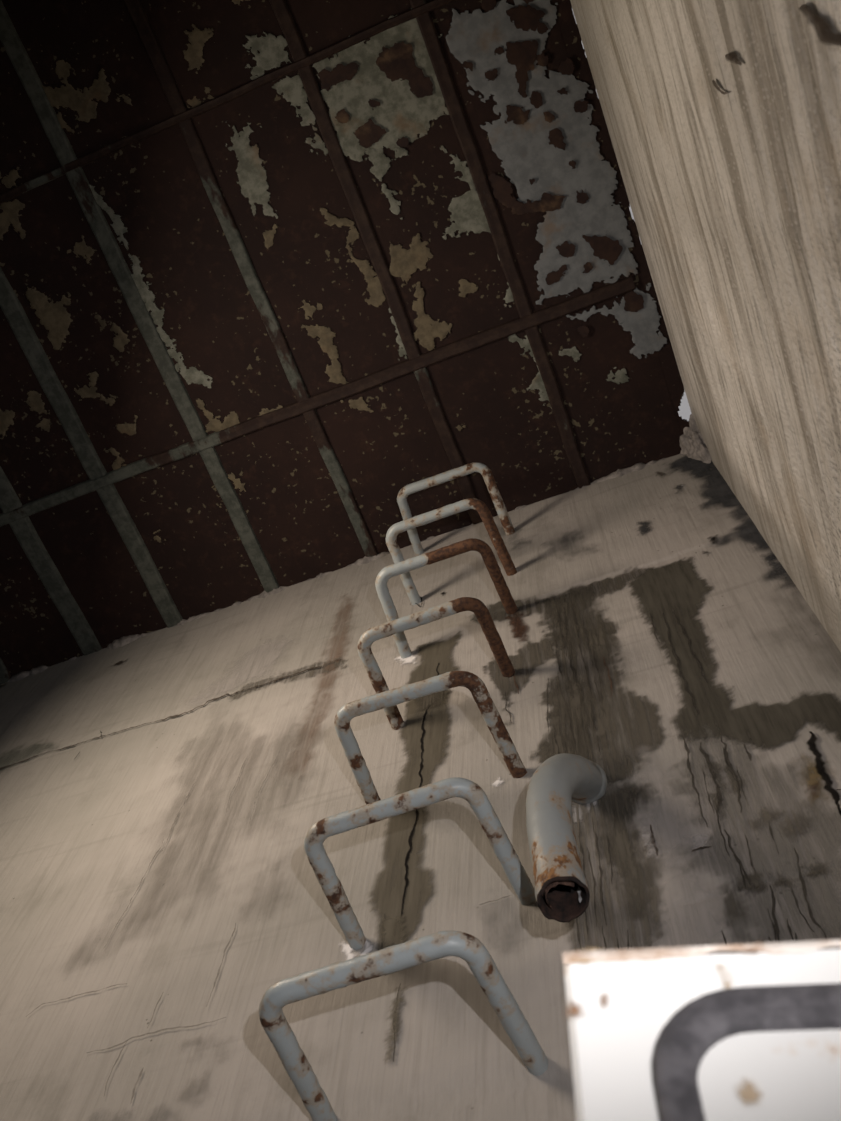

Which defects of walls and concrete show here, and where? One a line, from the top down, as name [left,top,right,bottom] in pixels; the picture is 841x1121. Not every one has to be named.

peeling [42,60,133,135]
peeling [183,24,214,74]
peeling [243,8,449,220]
peeling [0,167,26,240]
peeling [225,122,278,249]
peeling [438,0,667,384]
peeling [25,287,73,350]
peeling [89,184,240,436]
peeling [298,300,352,384]
peeling [320,208,452,361]
leakage [472,455,841,951]
crack [807,731,841,815]